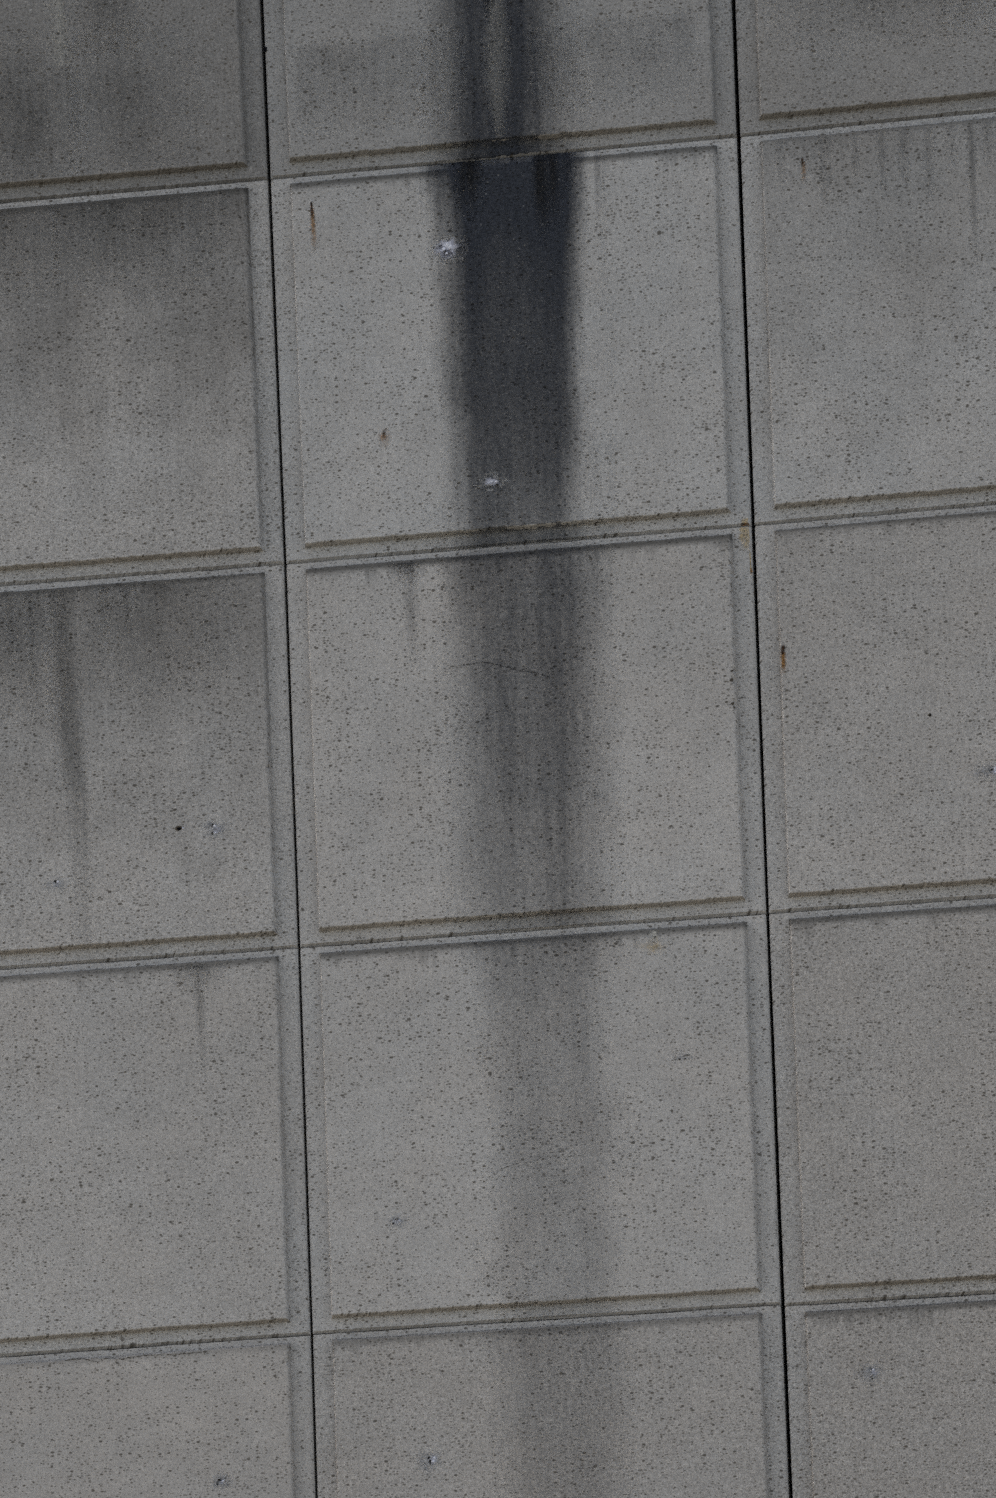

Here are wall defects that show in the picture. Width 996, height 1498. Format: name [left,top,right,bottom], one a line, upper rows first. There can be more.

leakage [434,0,578,790]